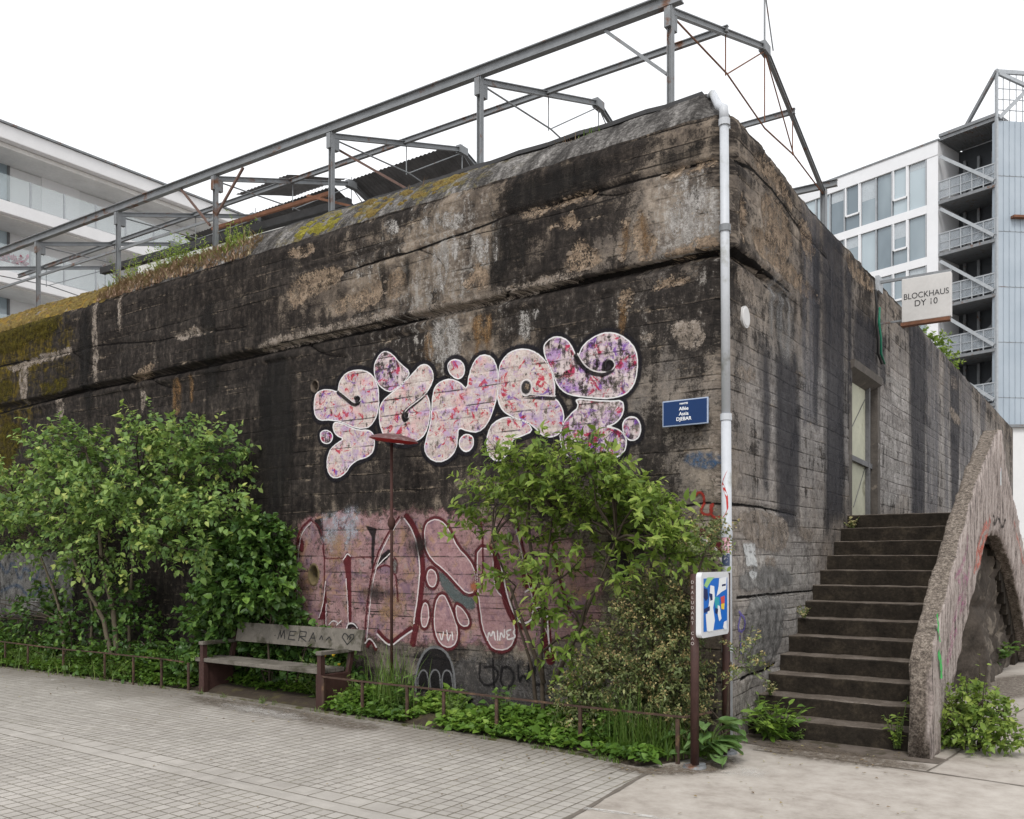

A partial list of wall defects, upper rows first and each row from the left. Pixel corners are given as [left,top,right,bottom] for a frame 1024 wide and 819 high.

water stain [473,158,606,289]
crack [306,159,827,286]
water stain [664,176,719,263]
water stain [19,365,29,404]
crack [0,247,789,414]
water stain [763,209,985,531]